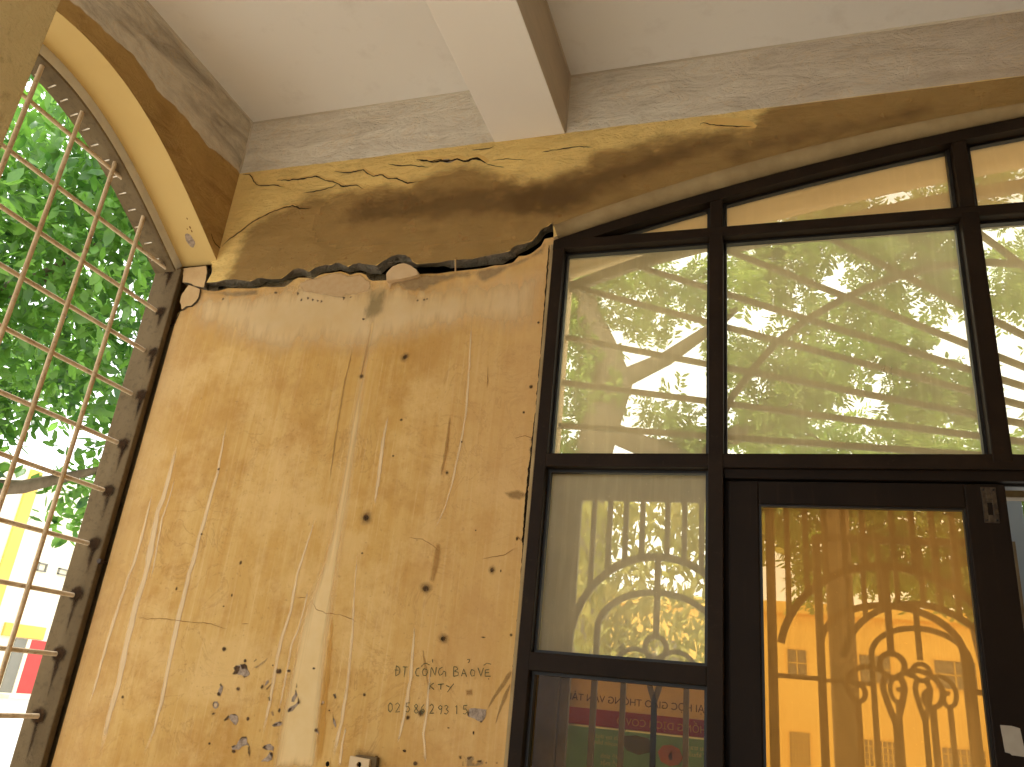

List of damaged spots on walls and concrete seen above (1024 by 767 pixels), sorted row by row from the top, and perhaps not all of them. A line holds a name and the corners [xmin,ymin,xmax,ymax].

crack [211,146,587,248]
water stain [206,76,1024,343]
flaking render [297,273,370,302]
peeling [233,662,263,678]
peeling [212,684,238,725]
peeling [261,680,300,727]
peeling [232,737,274,762]